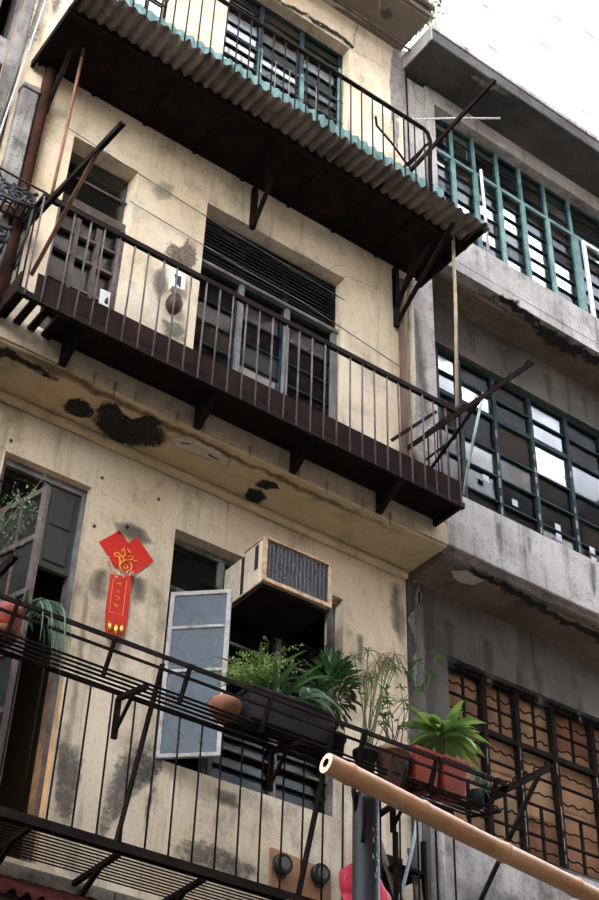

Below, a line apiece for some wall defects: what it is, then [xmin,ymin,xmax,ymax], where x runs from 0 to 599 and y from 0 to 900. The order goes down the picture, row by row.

peeling [278,0,354,49]
leakage [29,355,355,513]
leakage [56,743,80,819]
leakage [100,745,161,834]